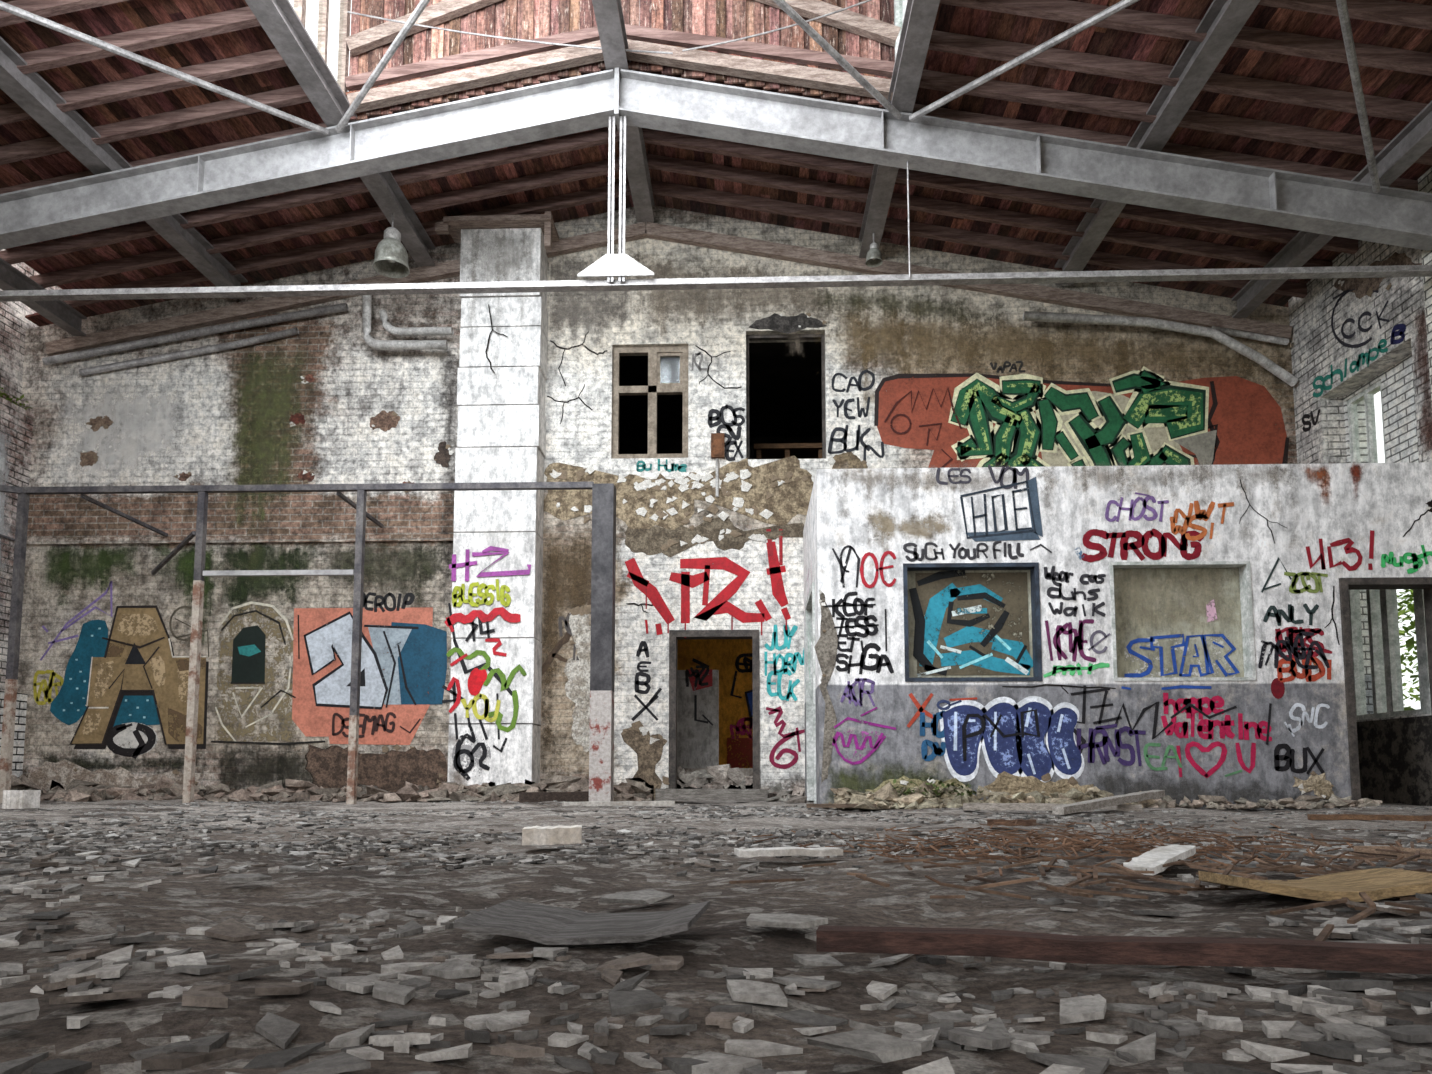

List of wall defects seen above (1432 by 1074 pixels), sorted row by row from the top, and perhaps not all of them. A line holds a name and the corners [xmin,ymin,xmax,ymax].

leakage [232,355,295,613]
peeling [543,456,814,557]
peeling [828,452,868,469]
leakage [286,549,299,601]
peeling [564,605,591,752]